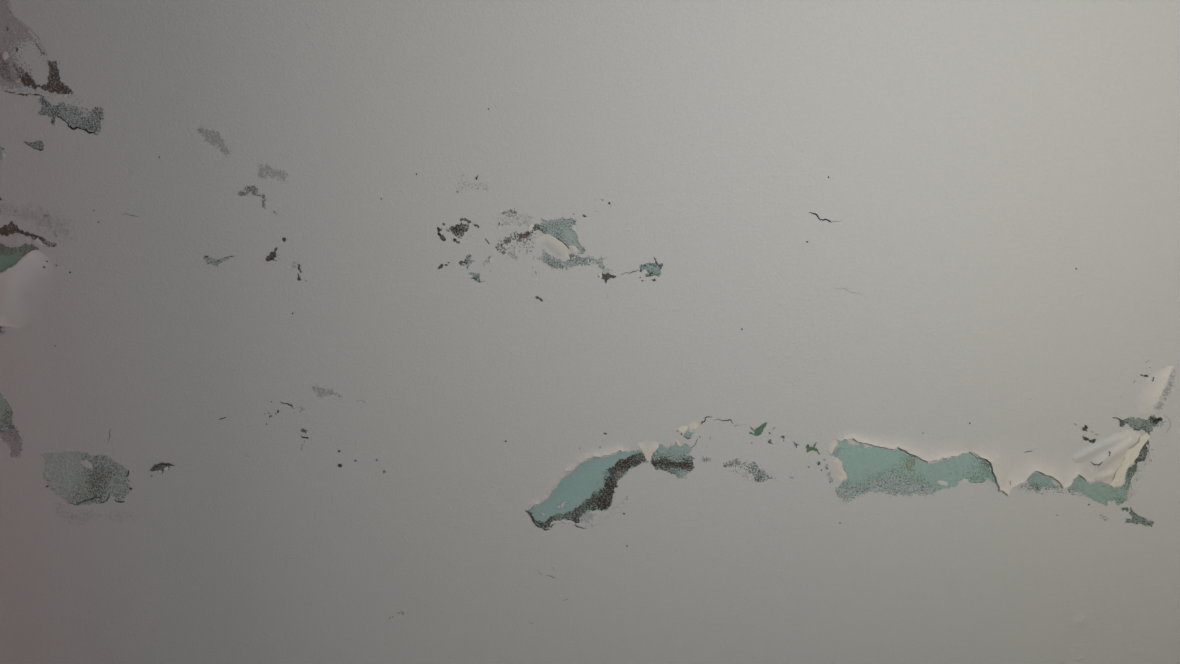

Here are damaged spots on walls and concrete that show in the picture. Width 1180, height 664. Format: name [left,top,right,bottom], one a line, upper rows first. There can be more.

peeling [0,0,104,132]
peeling [0,198,66,334]
peeling [438,254,480,282]
peeling [495,199,663,283]
peeling [0,393,22,458]
peeling [40,450,132,505]
peeling [525,421,700,531]
peeling [749,415,1171,527]